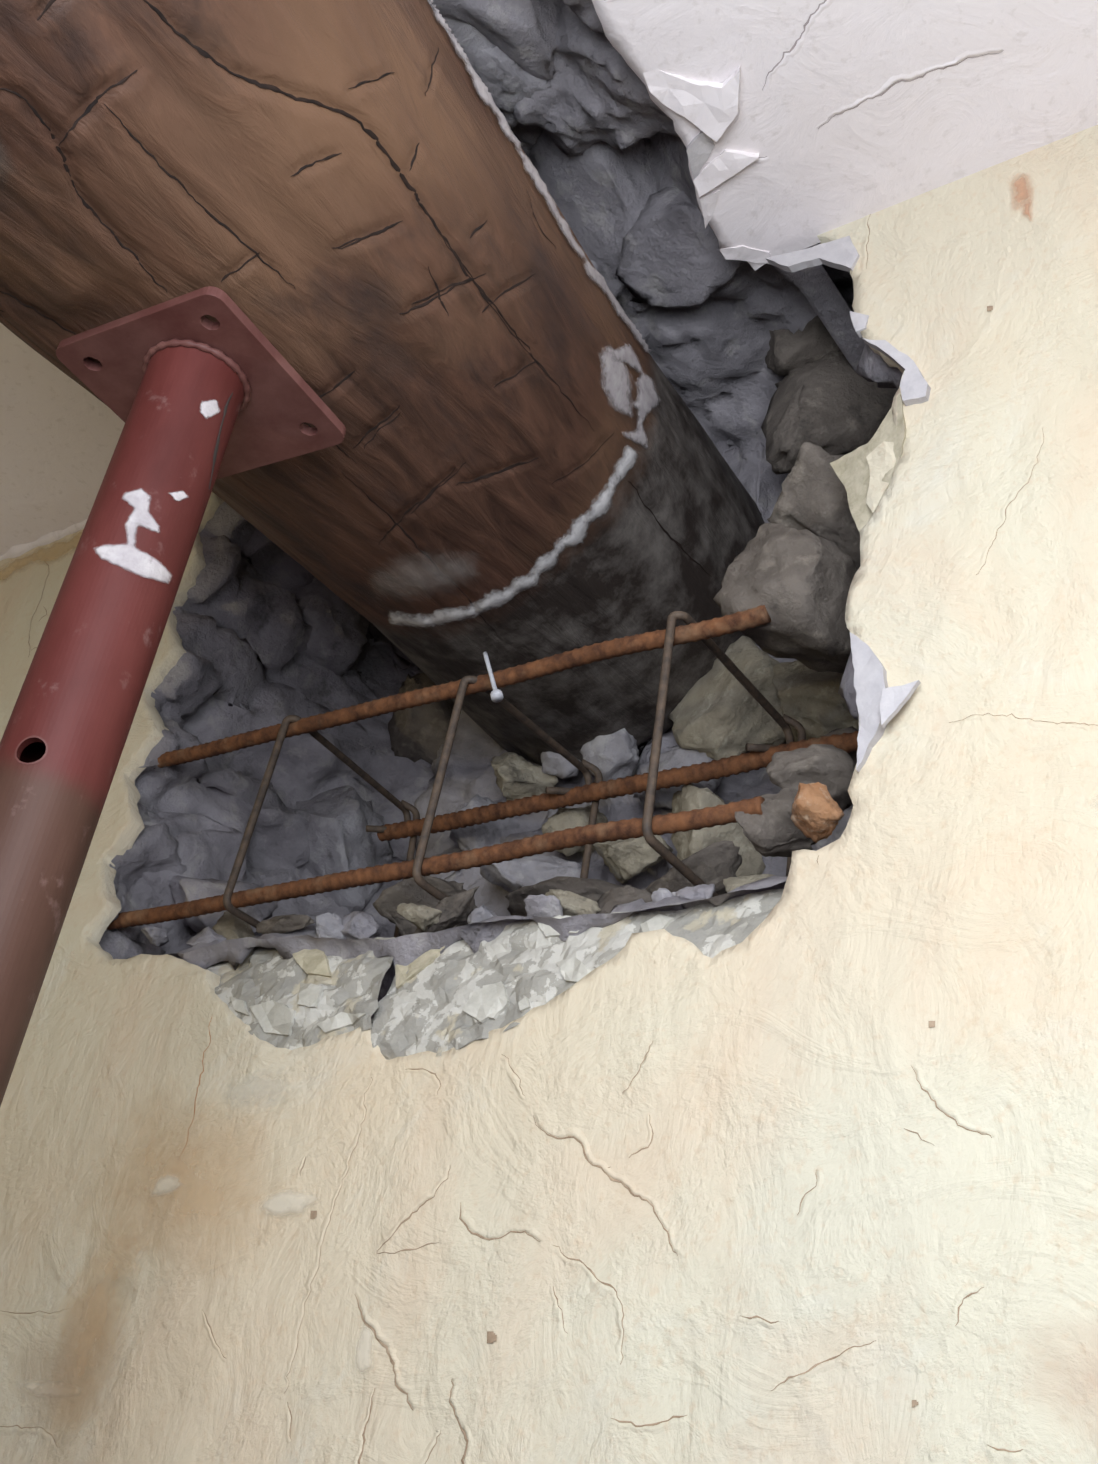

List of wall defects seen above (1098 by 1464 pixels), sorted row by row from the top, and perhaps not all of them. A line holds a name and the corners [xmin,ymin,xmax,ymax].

crack [0,70,295,292]
crack [143,0,614,637]
flaking render [643,66,759,228]
flaking render [719,236,860,273]
crack [816,47,1003,129]
flaking render [830,311,931,532]
flaking render [850,632,921,772]
flaking render [206,889,784,1060]
crack [499,1041,683,1256]
crack [904,1062,998,1146]
crack [374,1165,624,1365]
crack [352,1291,487,1464]